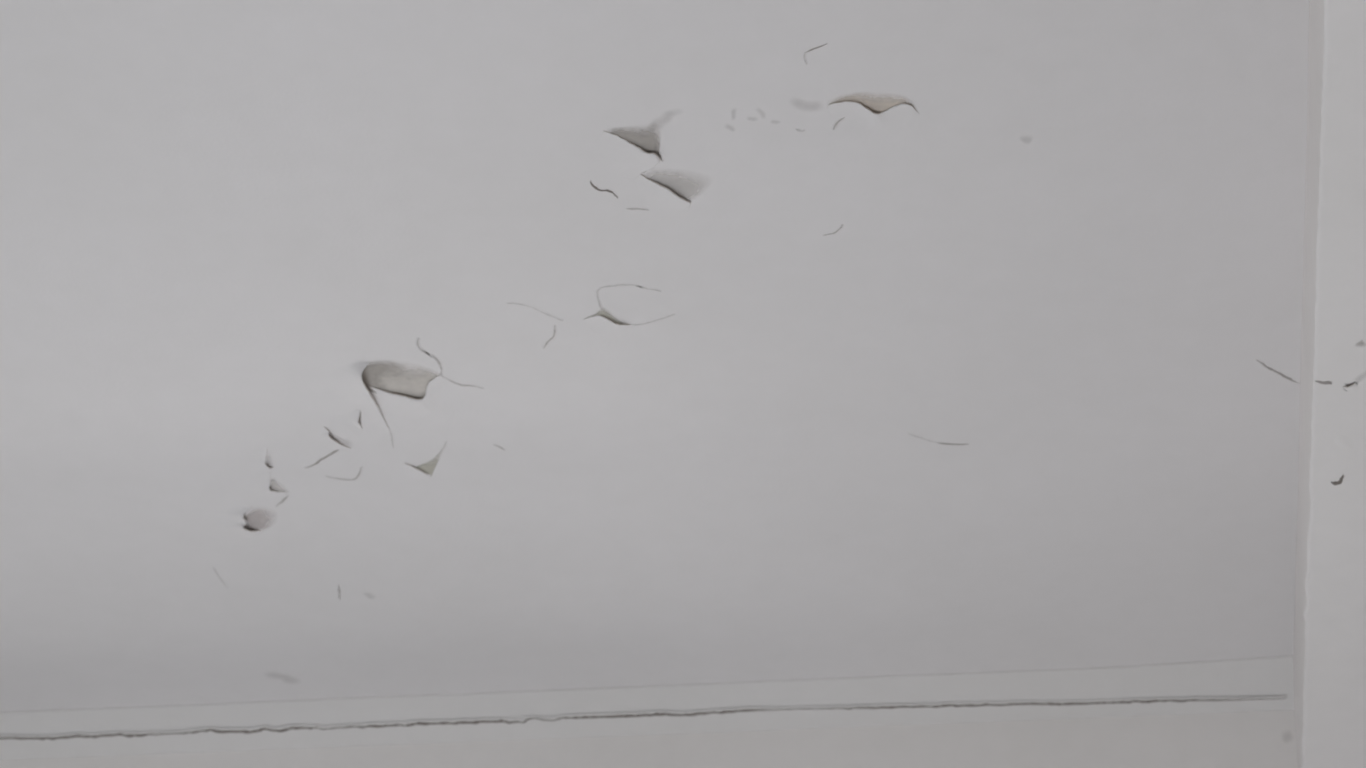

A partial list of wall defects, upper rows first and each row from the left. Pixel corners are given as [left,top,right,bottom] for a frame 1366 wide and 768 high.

peeling [314,337,484,485]